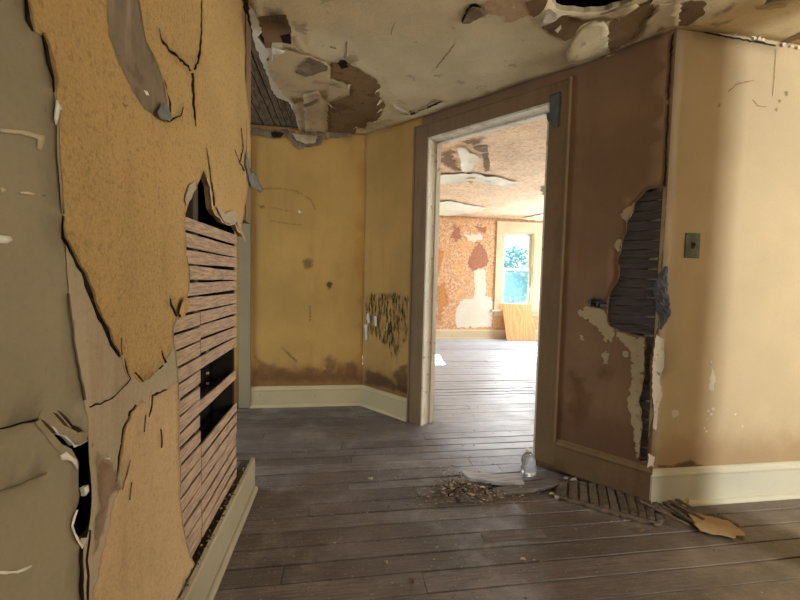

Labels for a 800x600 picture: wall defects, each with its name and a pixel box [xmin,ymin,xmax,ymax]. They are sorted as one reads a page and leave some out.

peeling [54,100,63,125]
flaking render [107,0,167,121]
crack [159,0,203,126]
flaking render [242,0,318,127]
spalling [541,3,639,33]
crack [704,32,800,107]
crack [24,0,166,500]
flaking render [51,178,241,600]
water stain [366,293,408,353]
water stain [367,366,407,393]
flaking render [455,269,493,328]
flaking render [578,187,665,468]